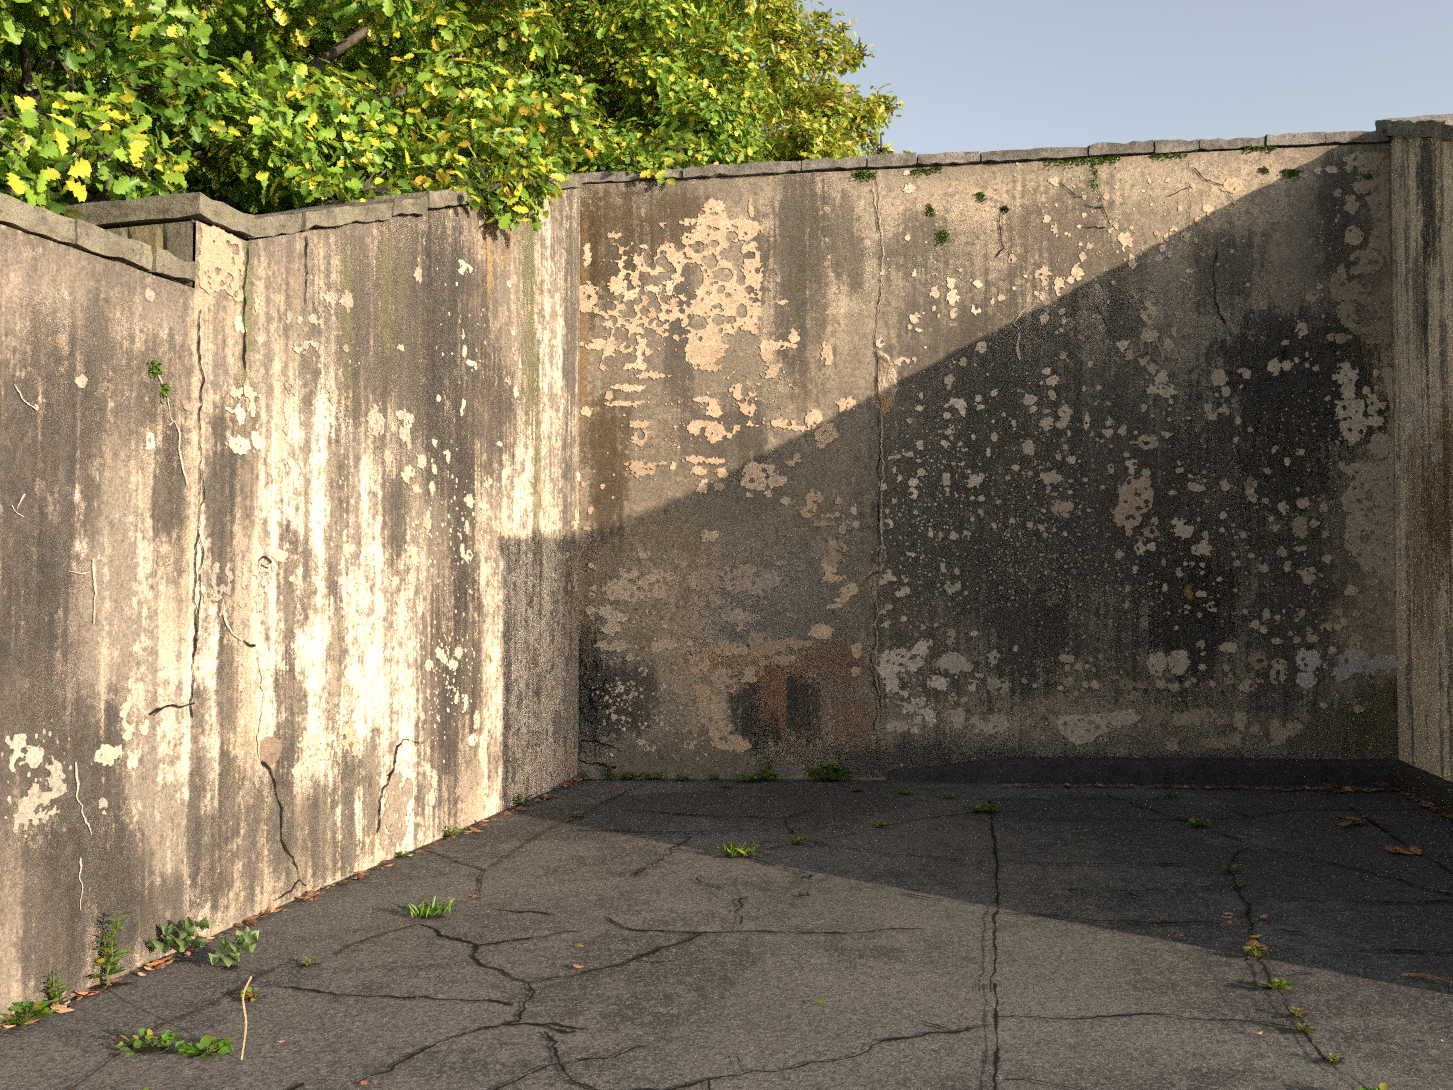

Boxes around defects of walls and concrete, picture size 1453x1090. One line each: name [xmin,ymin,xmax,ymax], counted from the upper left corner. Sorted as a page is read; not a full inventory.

peeling [224,382,262,455]
peeling [197,223,360,406]
water stain [325,211,480,630]
water stain [563,189,652,541]
peeling [517,152,1444,762]
water stain [1205,302,1389,523]
peeling [0,719,72,838]
water stain [21,691,129,997]
crack [75,762,92,910]
crack [377,739,420,835]
crack [278,808,962,1090]
crack [635,794,1453,1090]